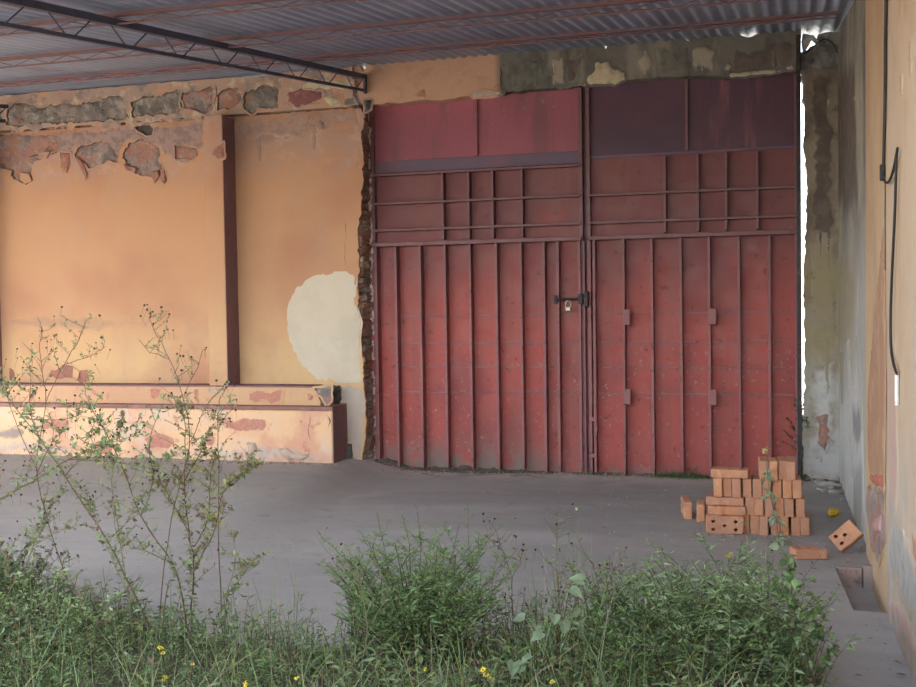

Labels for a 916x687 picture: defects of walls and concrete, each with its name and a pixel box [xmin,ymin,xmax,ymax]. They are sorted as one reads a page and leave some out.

peeling [555,59,627,90]
peeling [727,63,796,79]
water stain [808,32,861,260]
flaking render [0,76,376,460]
flaking render [812,411,833,454]